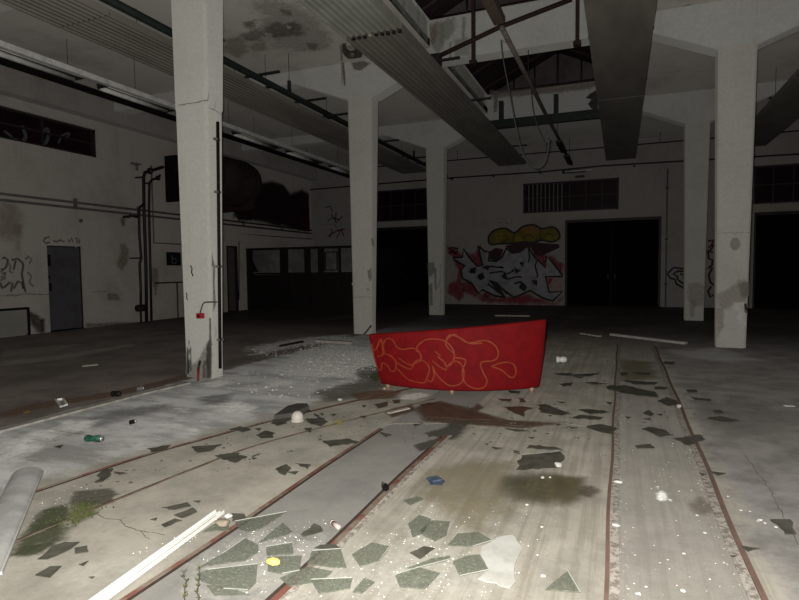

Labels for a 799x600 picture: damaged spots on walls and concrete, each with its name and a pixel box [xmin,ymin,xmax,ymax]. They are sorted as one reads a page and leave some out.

leakage [386,401,555,450]
leakage [434,465,597,514]
crack [97,514,165,540]